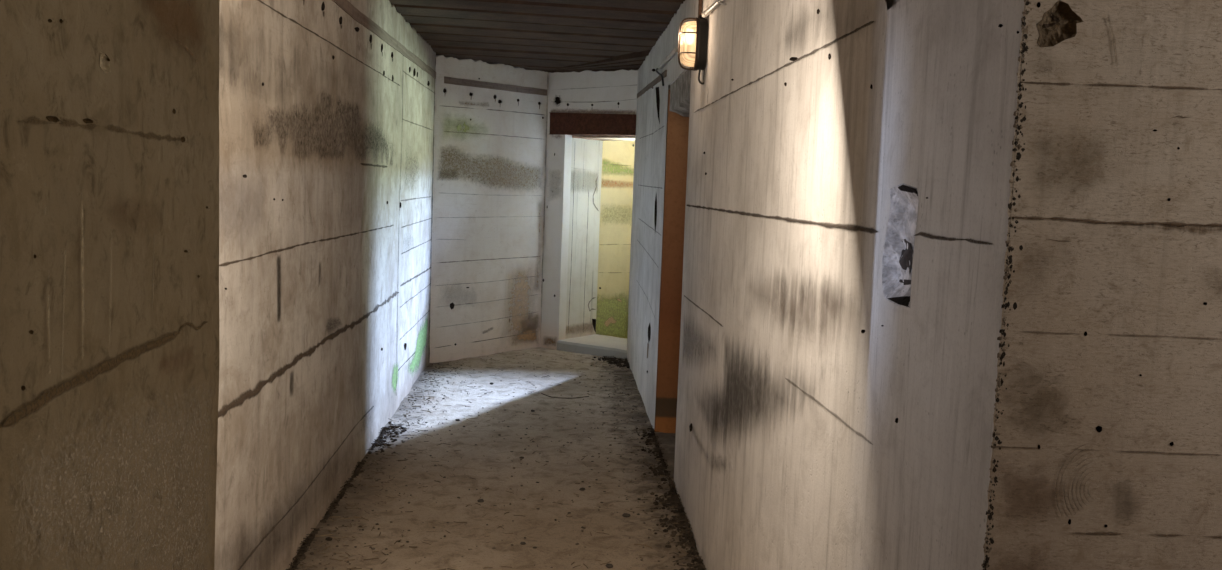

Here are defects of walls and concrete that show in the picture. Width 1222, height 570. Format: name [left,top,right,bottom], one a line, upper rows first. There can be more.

crack [3,321,207,427]
crack [218,0,543,418]
spalling [882,183,919,308]
spalling [981,0,1084,570]